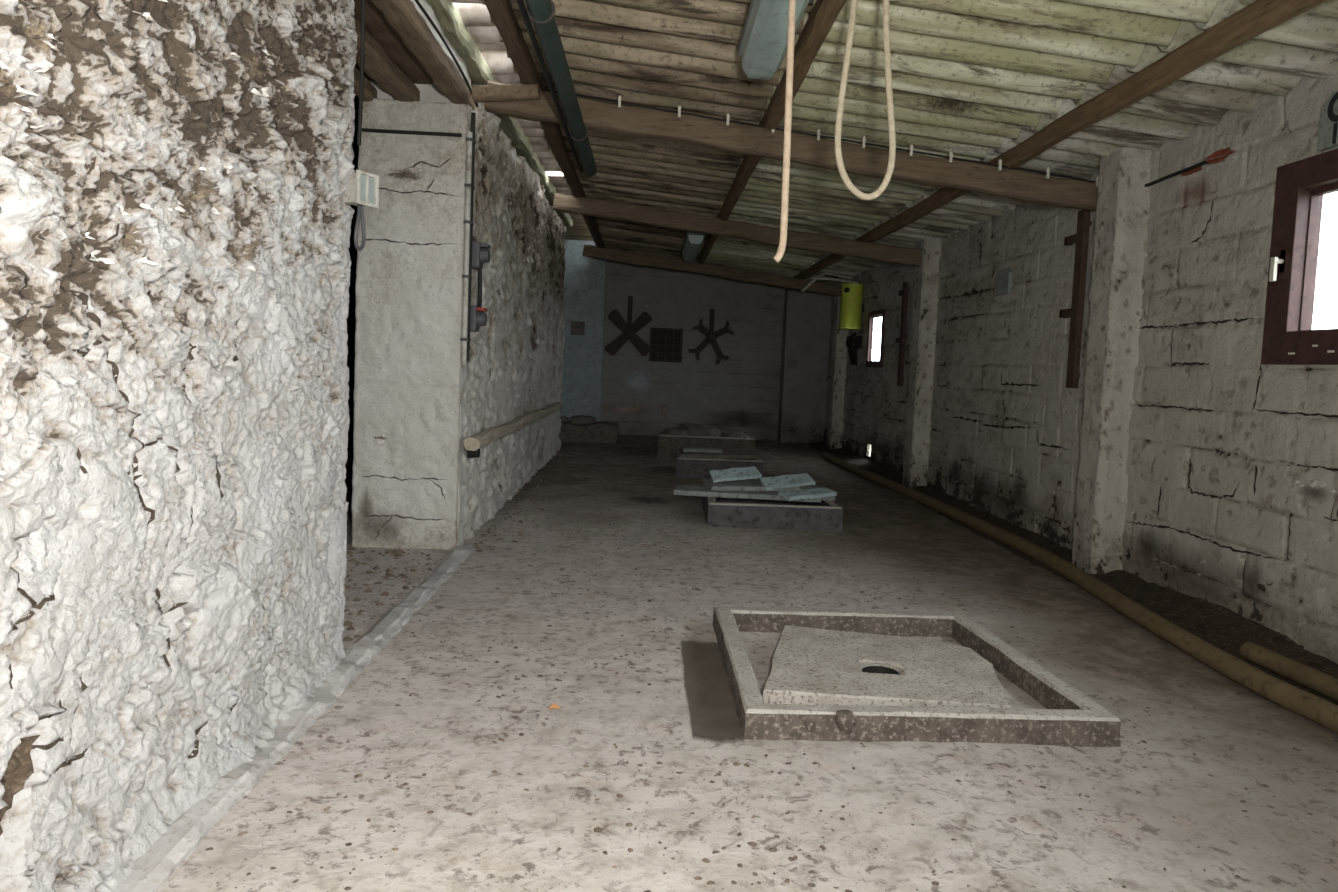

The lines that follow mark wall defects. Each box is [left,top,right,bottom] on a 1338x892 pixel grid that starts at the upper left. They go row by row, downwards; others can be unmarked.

peeling [0,50,44,130]
peeling [25,16,59,73]
peeling [231,49,284,97]
peeling [85,232,115,264]
peeling [109,166,232,265]
crack [182,319,240,403]
crack [5,265,181,544]
crack [8,567,55,689]
crack [155,588,188,674]
crack [31,673,88,778]
crack [188,685,267,759]
spalling [0,735,40,836]